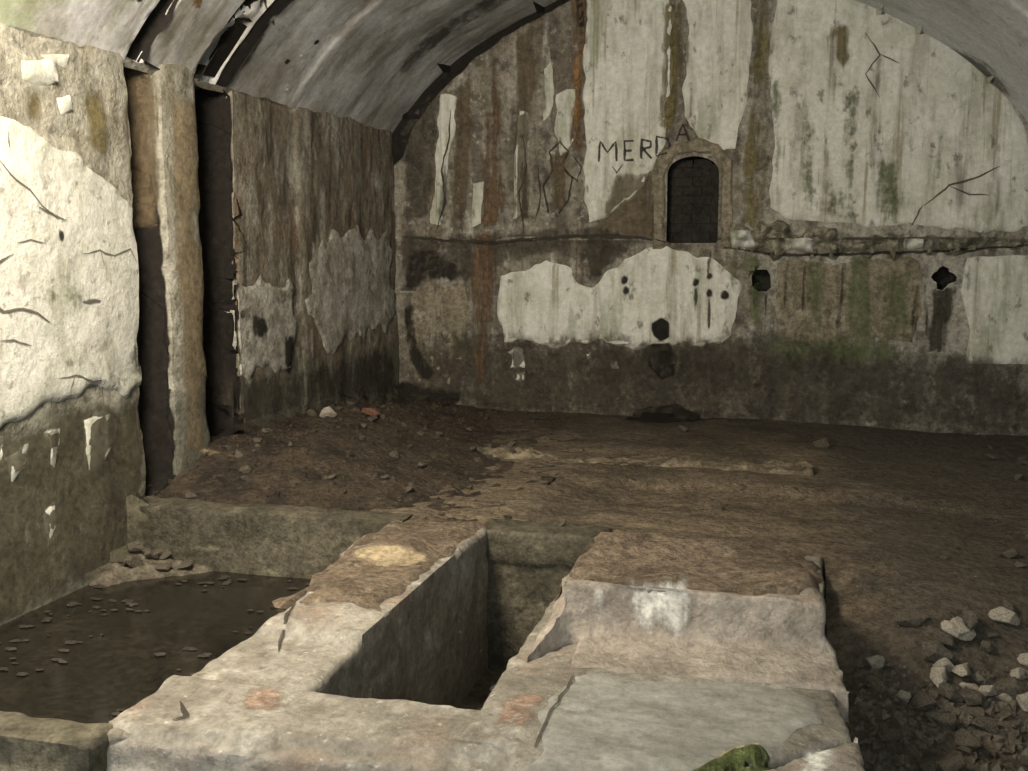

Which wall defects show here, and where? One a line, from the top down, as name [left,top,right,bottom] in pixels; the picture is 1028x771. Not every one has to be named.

damp [126,0,178,70]
crack [0,239,44,263]
crack [0,131,66,220]
damp [86,93,106,154]
flaking render [430,94,457,225]
flaking render [471,182,484,227]
damp [173,0,1022,451]
flaking render [497,0,756,380]
crack [724,166,1028,257]
crack [0,308,50,323]
damp [0,176,176,620]
damp [633,583,689,632]